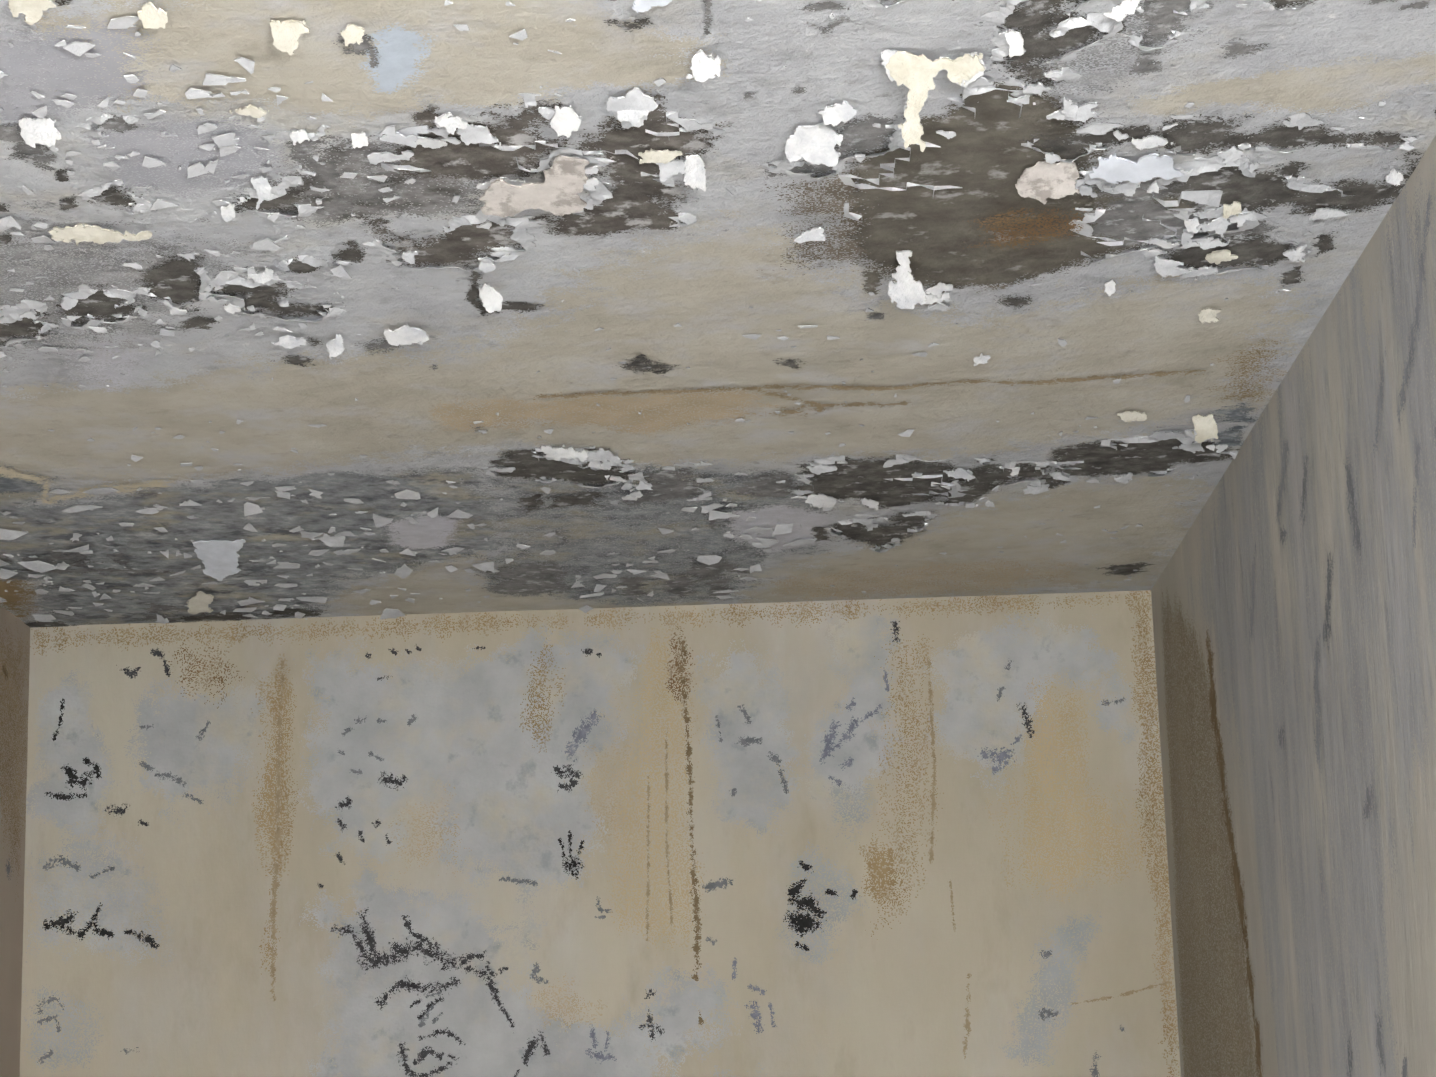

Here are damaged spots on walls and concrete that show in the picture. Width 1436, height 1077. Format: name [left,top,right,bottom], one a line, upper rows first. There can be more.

peeling [0,0,1431,625]
damp [754,161,1023,296]
damp [967,208,1087,251]
damp [1373,191,1432,457]
peeling [1322,547,1335,652]
damp [0,539,1259,1077]